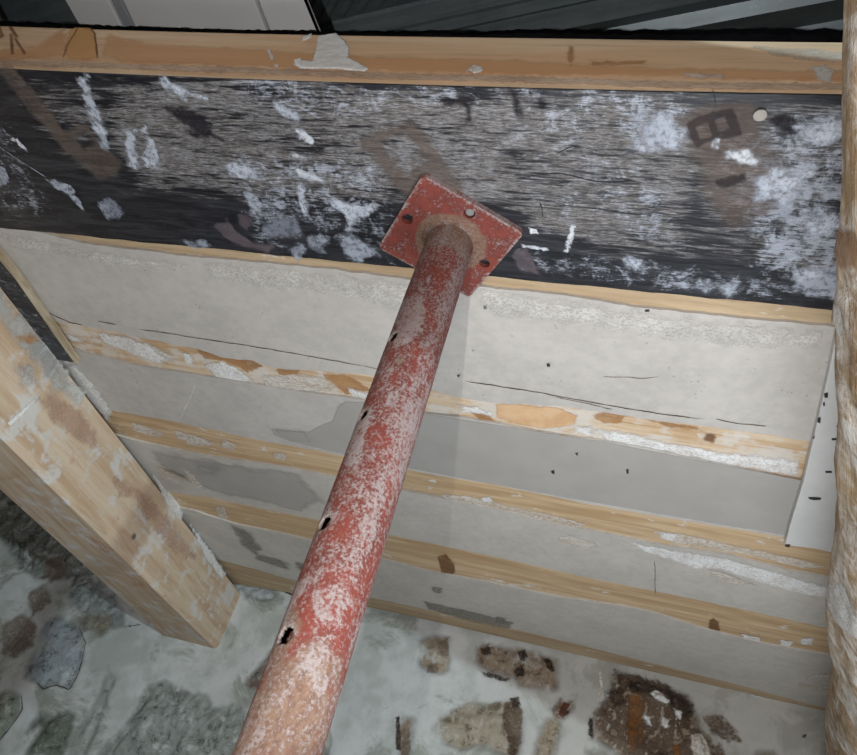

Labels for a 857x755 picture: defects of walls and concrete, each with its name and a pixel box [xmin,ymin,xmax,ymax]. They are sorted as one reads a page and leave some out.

water stain [133,126,159,167]
water stain [273,102,314,144]
water stain [789,116,842,146]
water stain [330,199,375,262]
water stain [291,235,327,260]
peeling [183,350,262,372]
peeling [325,375,369,399]
peeling [455,403,624,436]
peeling [659,422,715,442]
corrosion [428,641,448,672]
corrosion [396,717,410,755]
corrosion [490,697,522,755]